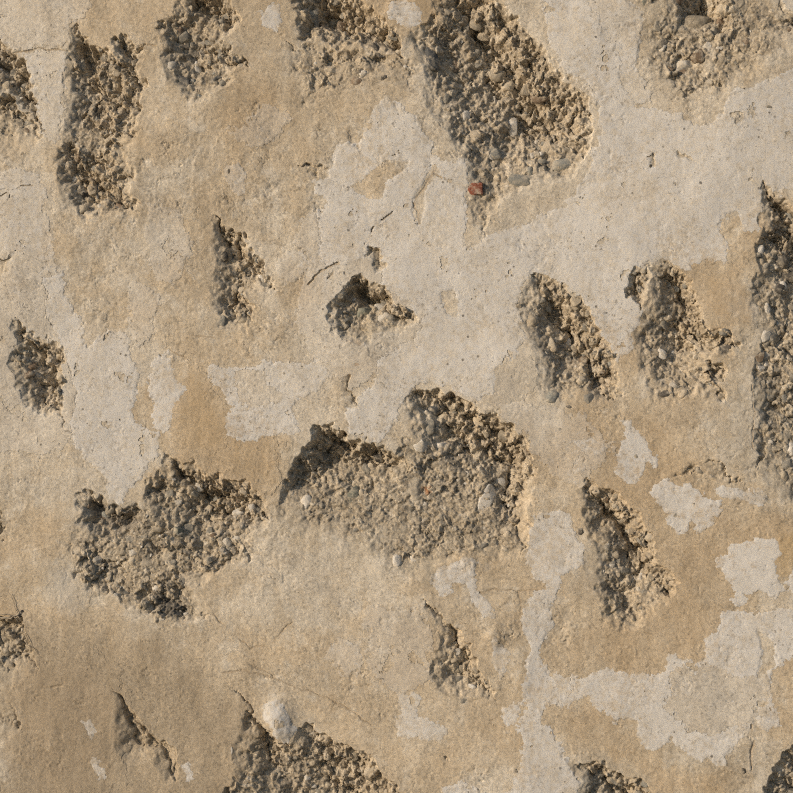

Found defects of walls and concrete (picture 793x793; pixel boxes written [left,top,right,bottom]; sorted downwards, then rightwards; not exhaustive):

spalling [155,0,253,103]
spalling [0,0,194,285]
peeling [0,167,187,519]
peeling [207,0,793,793]
flaking render [65,453,270,626]
flaking render [0,616,34,671]
peeling [80,719,97,740]
peeling [90,757,107,780]
spalling [121,708,195,785]